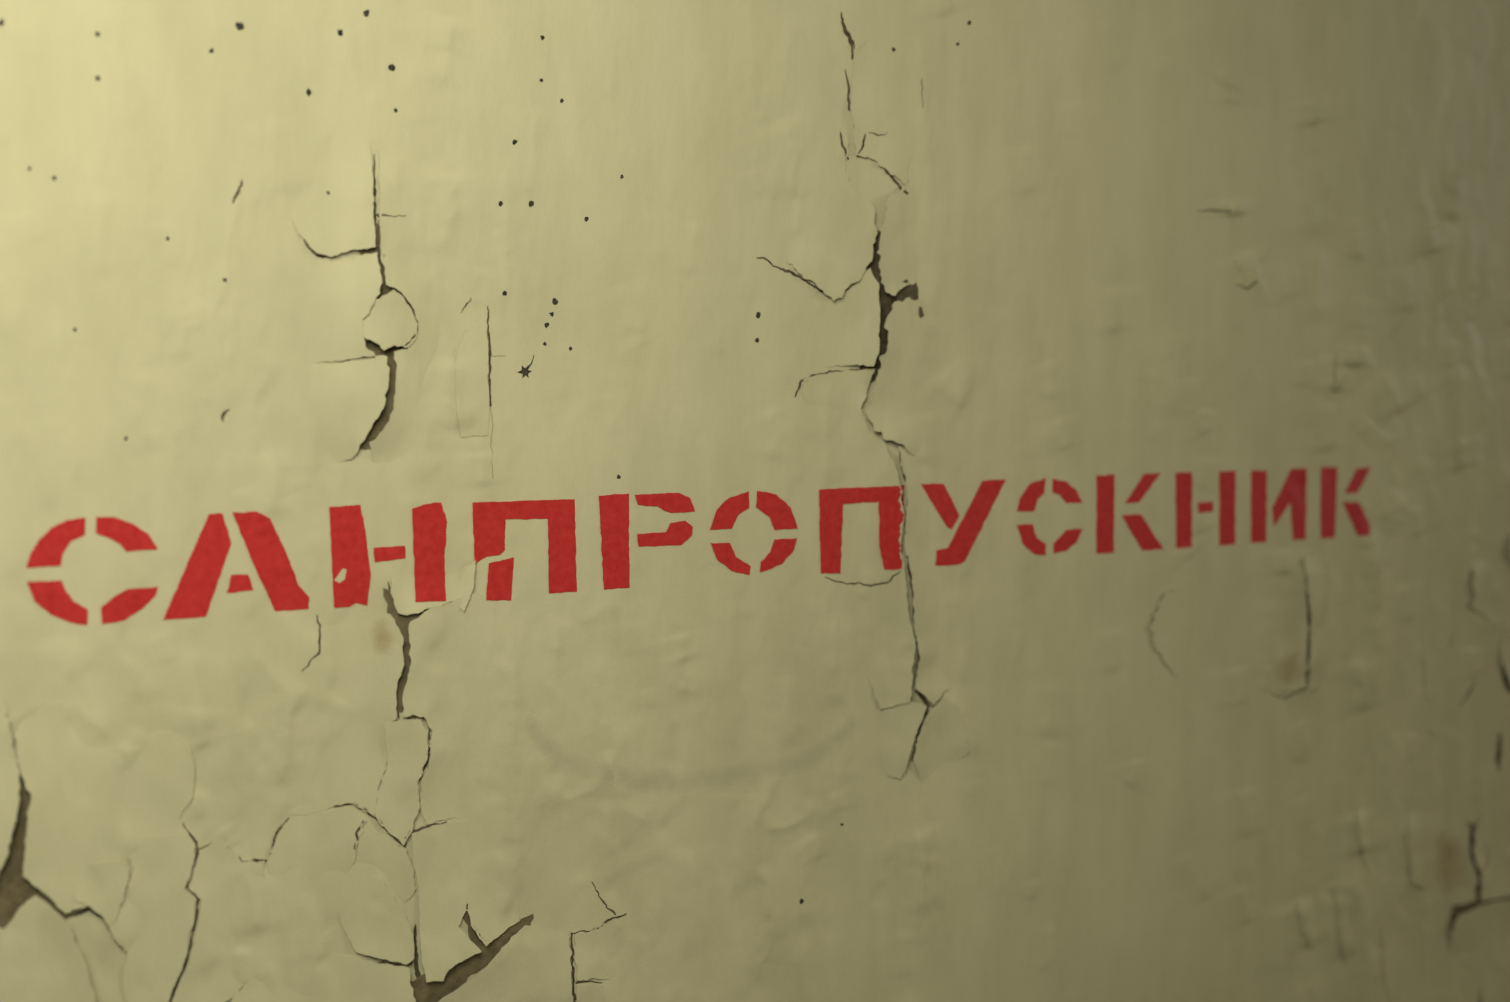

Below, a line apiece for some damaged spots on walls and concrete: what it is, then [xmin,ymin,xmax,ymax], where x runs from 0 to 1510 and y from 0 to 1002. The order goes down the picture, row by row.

crack [840,12,908,195]
crack [303,214,407,294]
crack [757,257,832,299]
crack [895,279,924,318]
crack [795,366,872,397]
crack [825,571,901,587]
peeling [1470,560,1510,692]
peeling [0,560,623,1002]